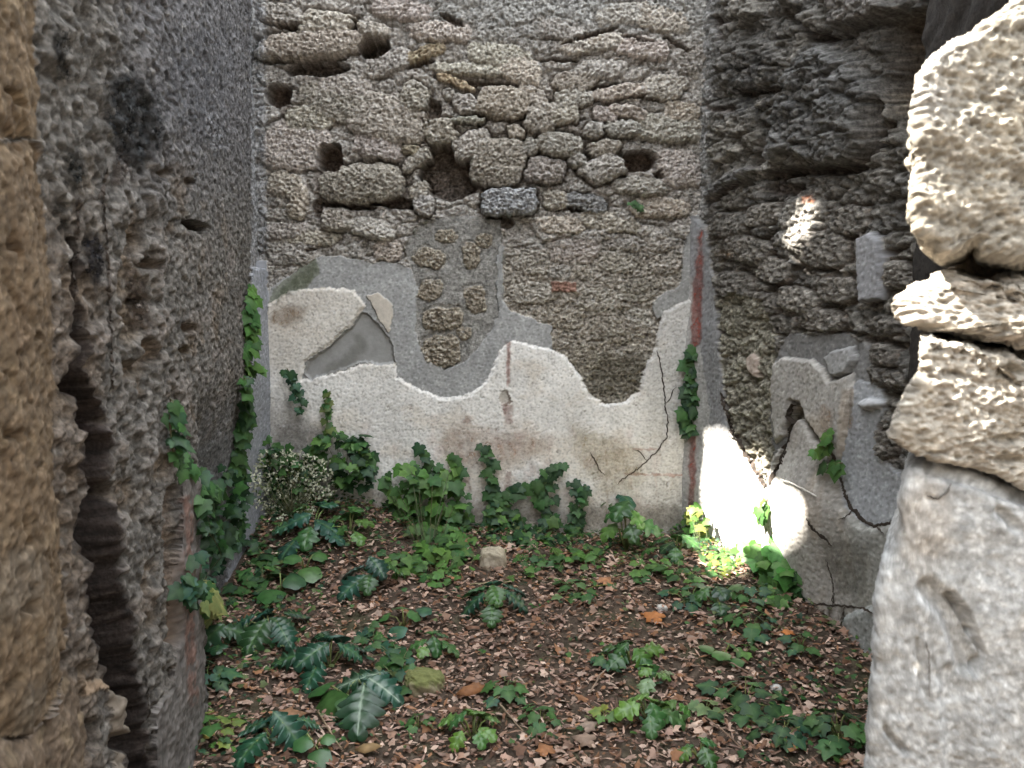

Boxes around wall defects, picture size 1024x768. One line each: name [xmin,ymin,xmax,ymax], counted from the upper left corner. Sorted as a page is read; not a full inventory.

water stain [111,77,161,184]
corrosion [691,230,704,347]
flaking render [267,214,691,538]
crack [590,352,677,485]
corrosion [688,436,696,505]
spalling [717,292,860,480]
crack [802,453,891,629]